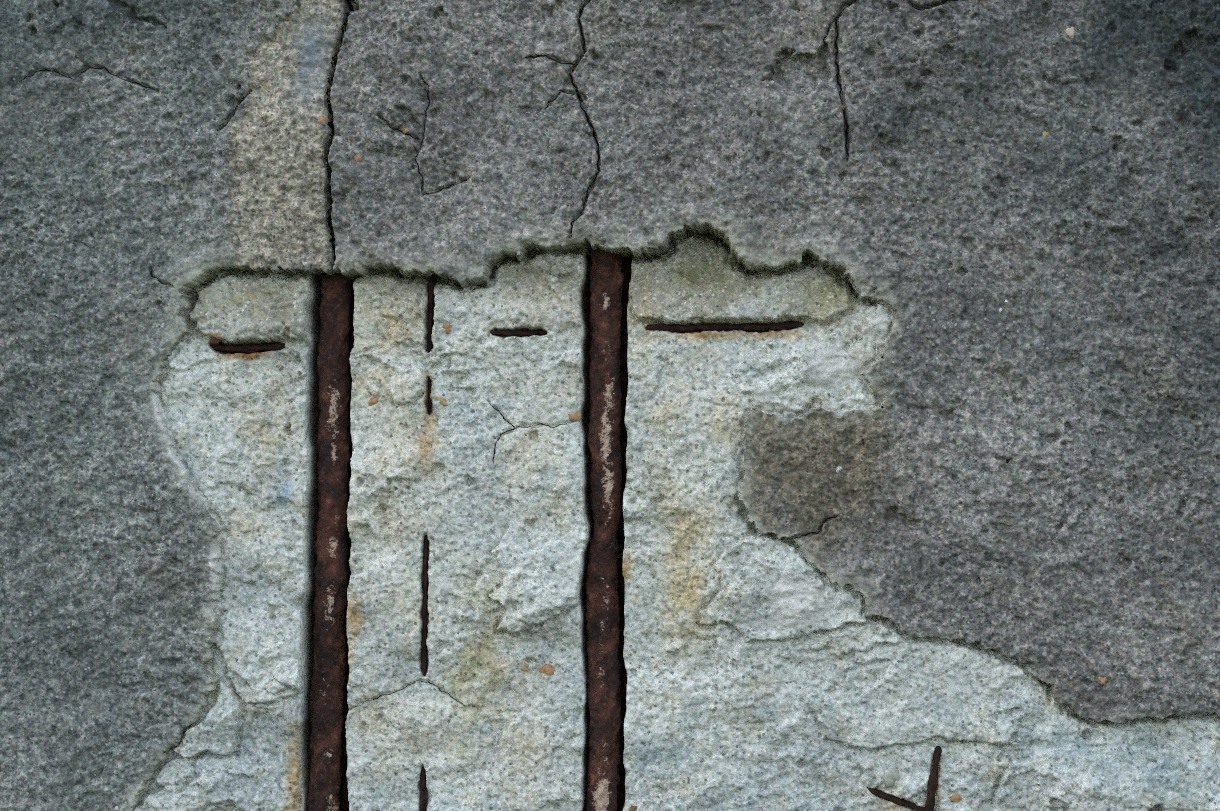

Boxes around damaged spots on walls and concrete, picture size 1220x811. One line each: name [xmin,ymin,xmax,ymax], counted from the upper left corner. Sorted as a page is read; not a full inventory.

crack [21,67,159,91]
crack [326,0,353,265]
crack [525,0,600,237]
spalling [763,41,832,93]
crack [823,0,856,161]
spalling [134,0,594,811]
spalling [585,233,1220,811]